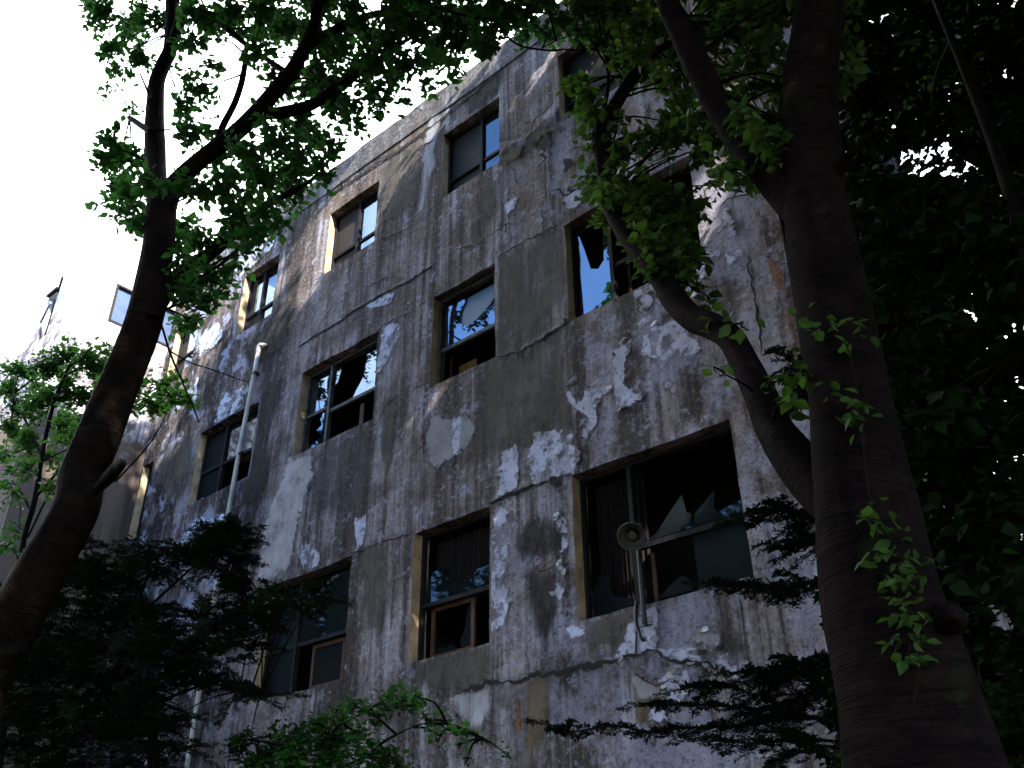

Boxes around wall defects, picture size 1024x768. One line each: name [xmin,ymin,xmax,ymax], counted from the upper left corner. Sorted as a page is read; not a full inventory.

crack [747,256,786,355]
flaking render [425,412,476,469]
flaking render [491,289,701,632]
peeling [354,514,367,551]
water stain [517,518,561,644]
crack [453,624,768,697]
flaking render [613,605,749,723]